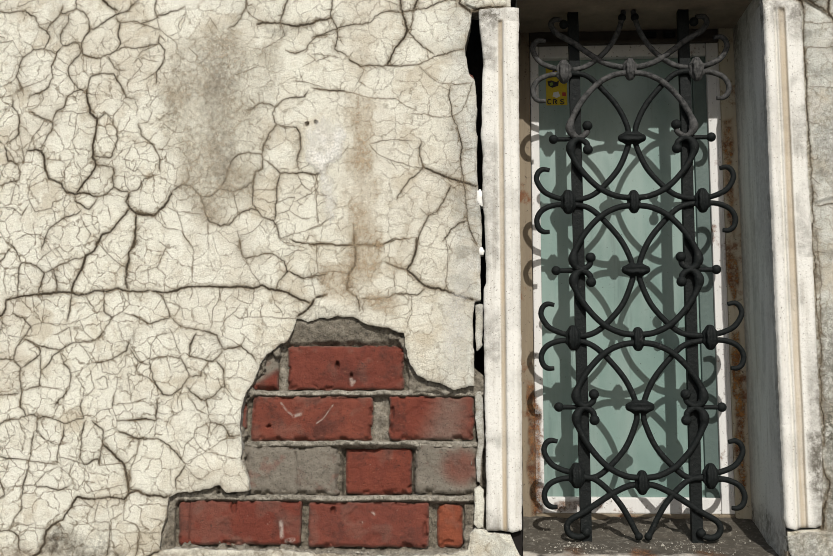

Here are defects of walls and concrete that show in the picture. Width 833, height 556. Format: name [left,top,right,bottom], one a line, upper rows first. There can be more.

crack [0,0,504,556]
corrosion [727,253,739,307]
crack [797,0,833,529]
spalling [161,316,516,556]
corrosion [731,332,746,496]